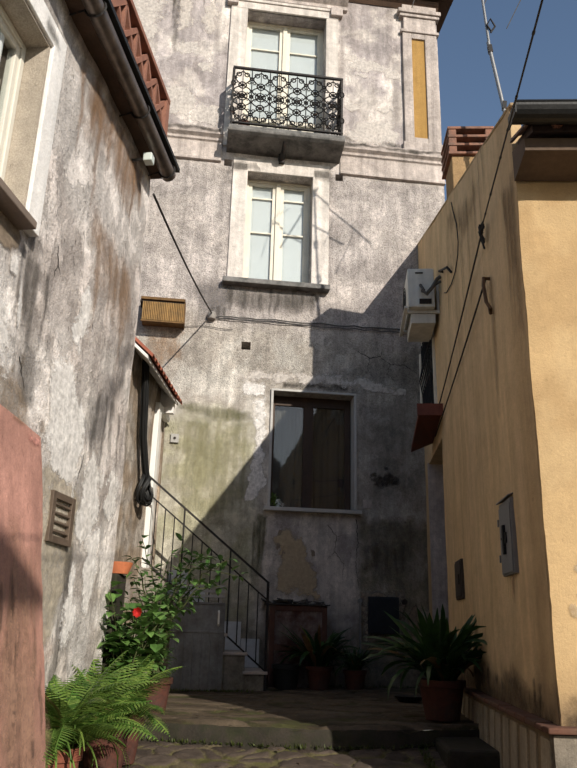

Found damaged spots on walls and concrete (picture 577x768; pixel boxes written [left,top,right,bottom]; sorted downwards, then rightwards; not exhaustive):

flaking render [243,382,268,501]